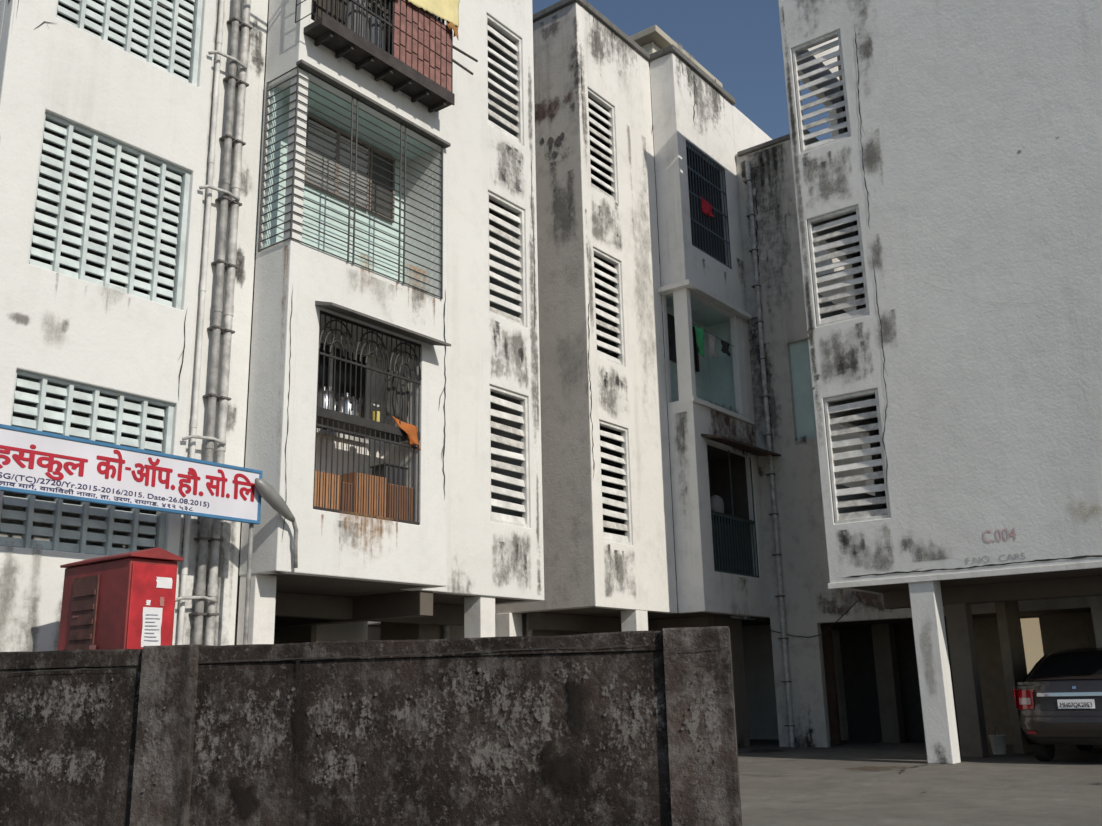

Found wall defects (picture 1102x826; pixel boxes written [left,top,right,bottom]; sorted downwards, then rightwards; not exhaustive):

water stain [499,12,633,193]
water stain [677,43,720,120]
crack [854,29,871,229]
water stain [553,170,575,239]
water stain [587,202,622,315]
water stain [741,67,869,379]
water stain [492,242,539,426]
water stain [601,372,627,414]
crack [872,256,888,485]
water stain [498,478,540,590]
water stain [606,544,628,596]
water stain [841,530,946,569]